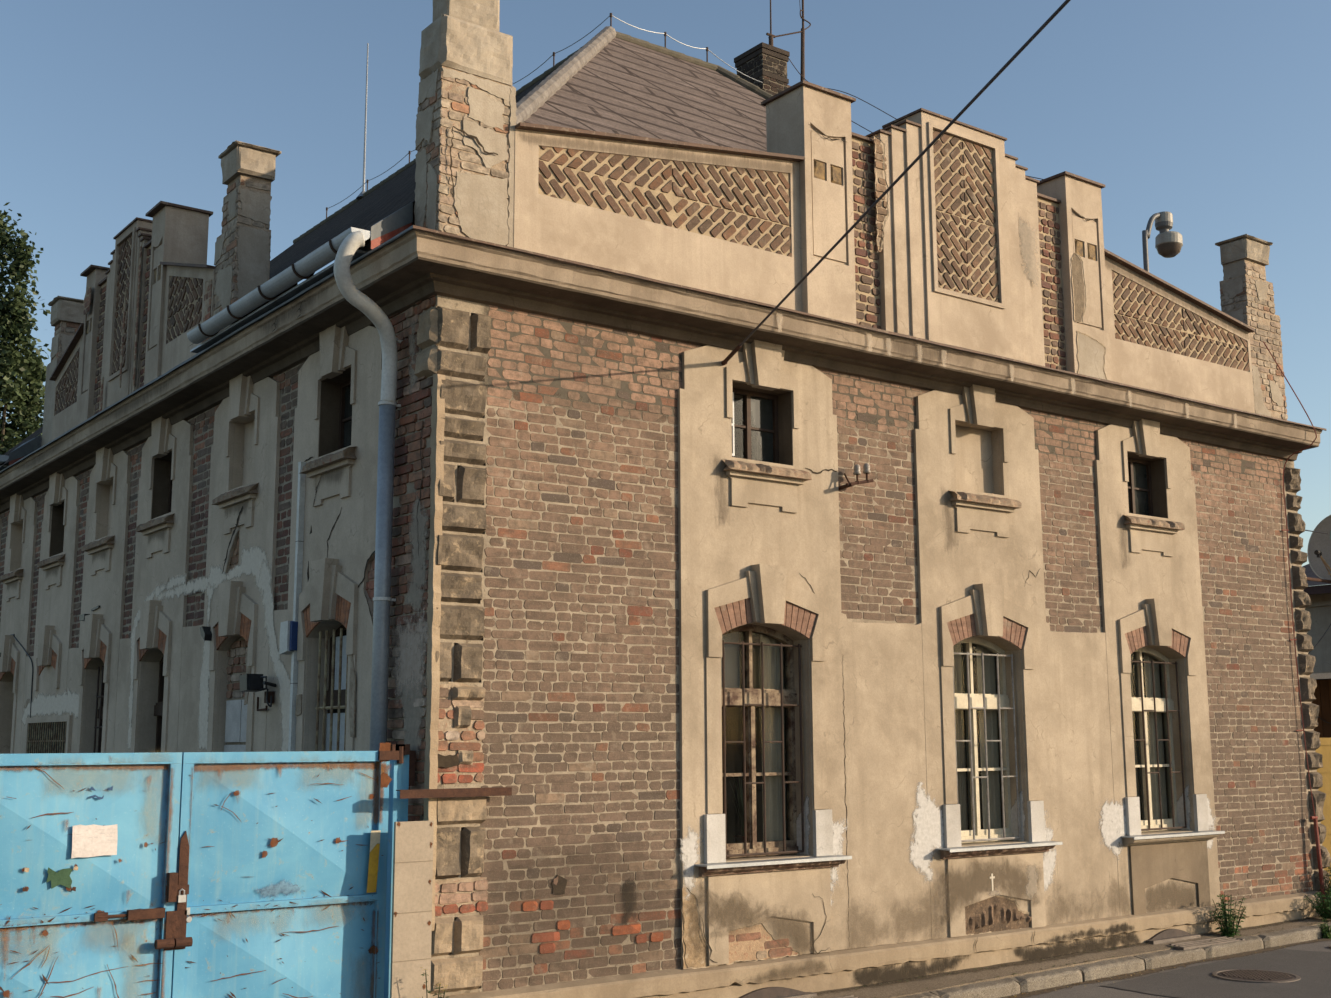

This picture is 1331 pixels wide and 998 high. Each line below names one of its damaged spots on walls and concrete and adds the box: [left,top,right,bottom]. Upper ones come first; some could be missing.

flaking render [417,71,510,235]
flaking render [1220,264,1288,420]
crack [222,506,243,573]
corrosion [194,742,392,823]
corrosion [0,764,173,998]
corrosion [325,901,378,998]